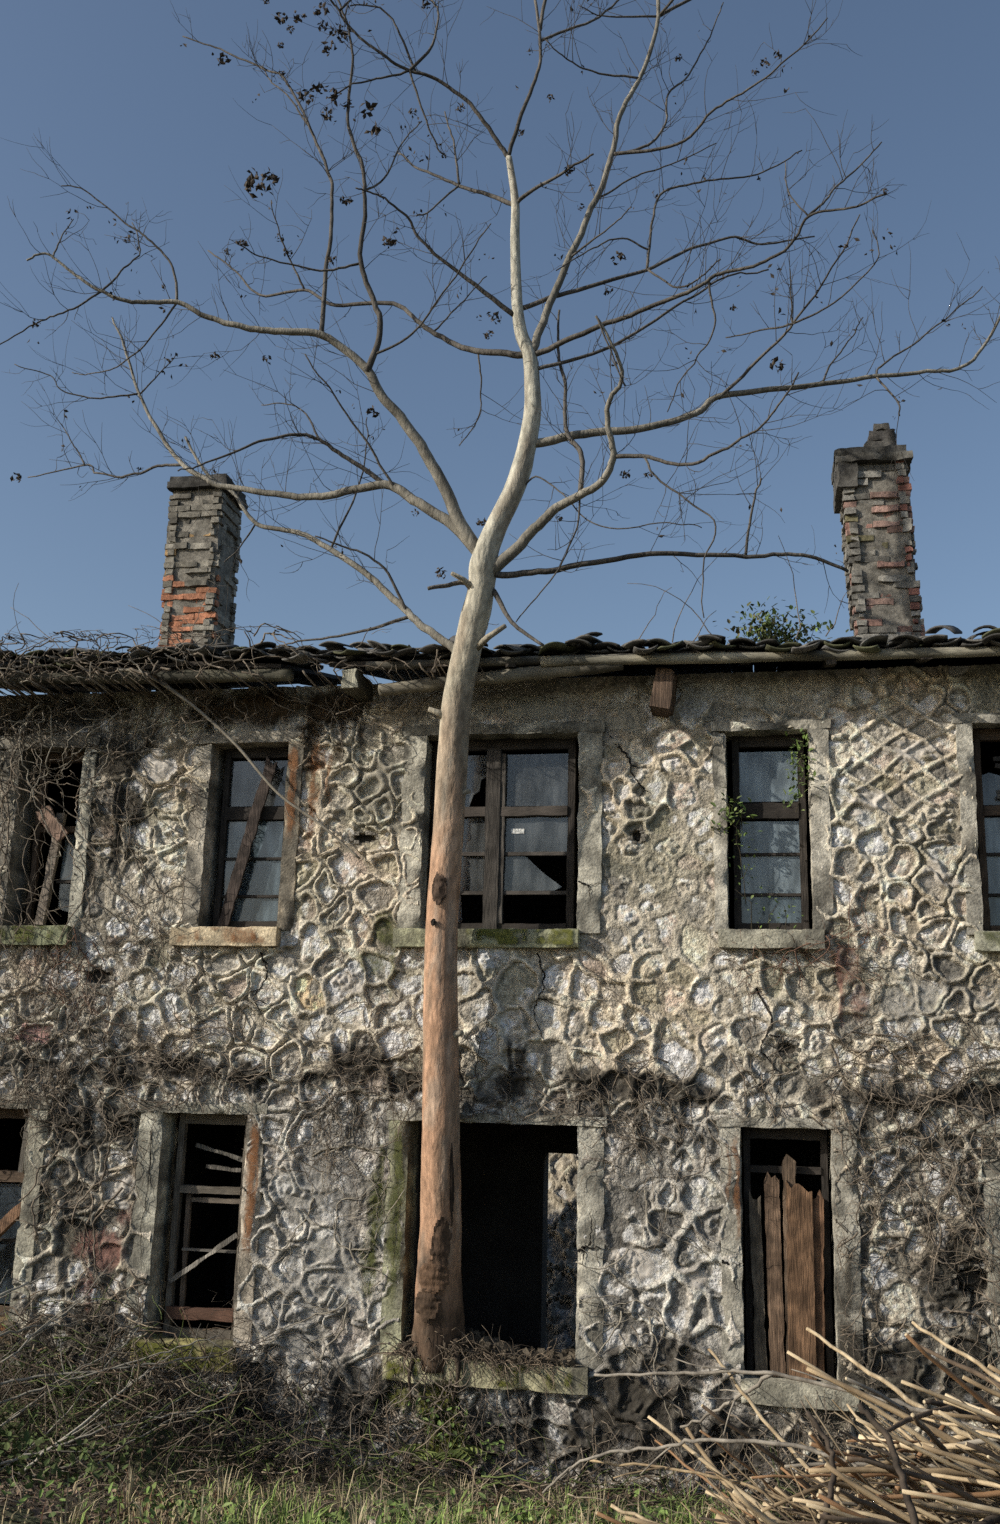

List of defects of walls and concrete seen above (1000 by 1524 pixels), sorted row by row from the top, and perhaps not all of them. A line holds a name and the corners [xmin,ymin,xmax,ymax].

leakage [299,1044,422,1130]
leakage [495,1043,528,1099]
rust [243,1126,259,1247]
leakage [323,1363,391,1453]
leakage [443,1393,546,1460]
leakage [562,1329,768,1478]